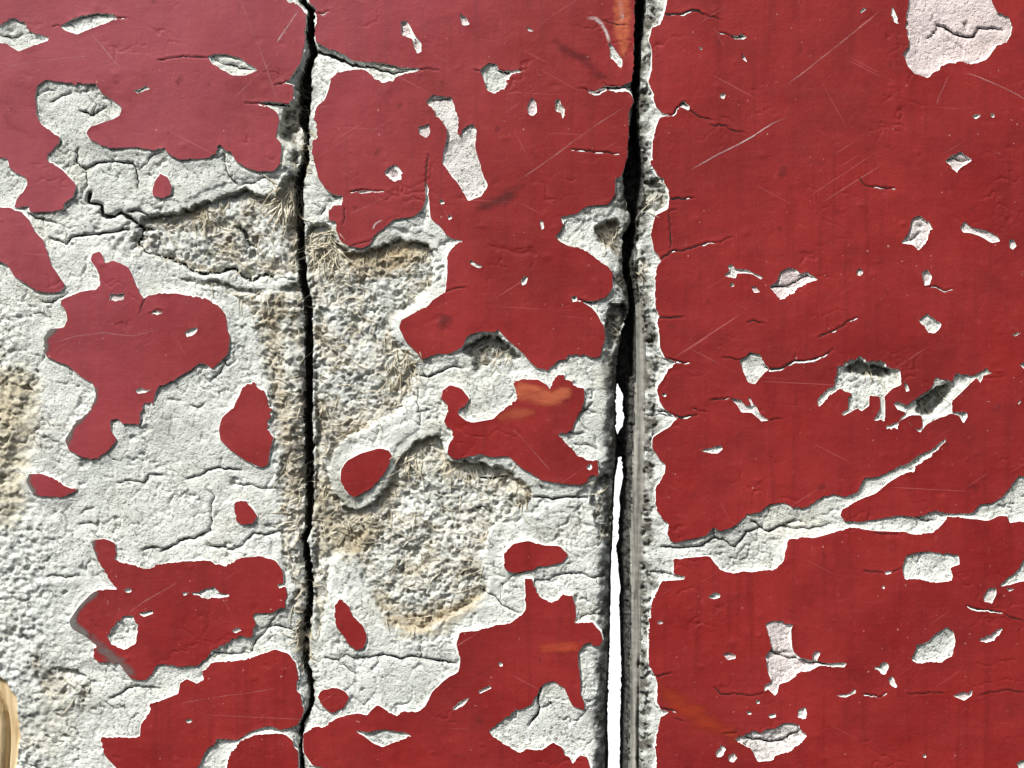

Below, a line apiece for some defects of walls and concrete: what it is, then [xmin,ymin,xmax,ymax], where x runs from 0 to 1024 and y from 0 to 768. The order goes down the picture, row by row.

crack [30,0,453,768]
peeling [0,40,631,768]
peeling [633,0,1024,768]